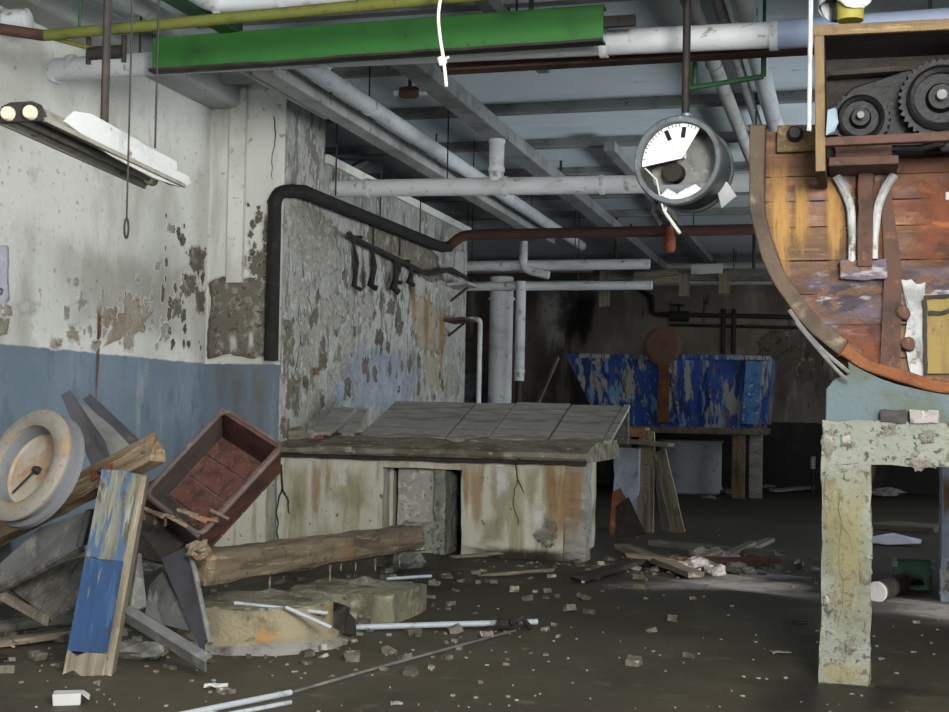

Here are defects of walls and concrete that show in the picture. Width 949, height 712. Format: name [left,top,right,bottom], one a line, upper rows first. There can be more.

flaking render [0,287,14,339]
flaking render [48,198,269,361]
flaking render [278,313,309,441]
peeling [309,287,344,373]
flaking render [342,224,466,402]
spalling [939,558,949,597]